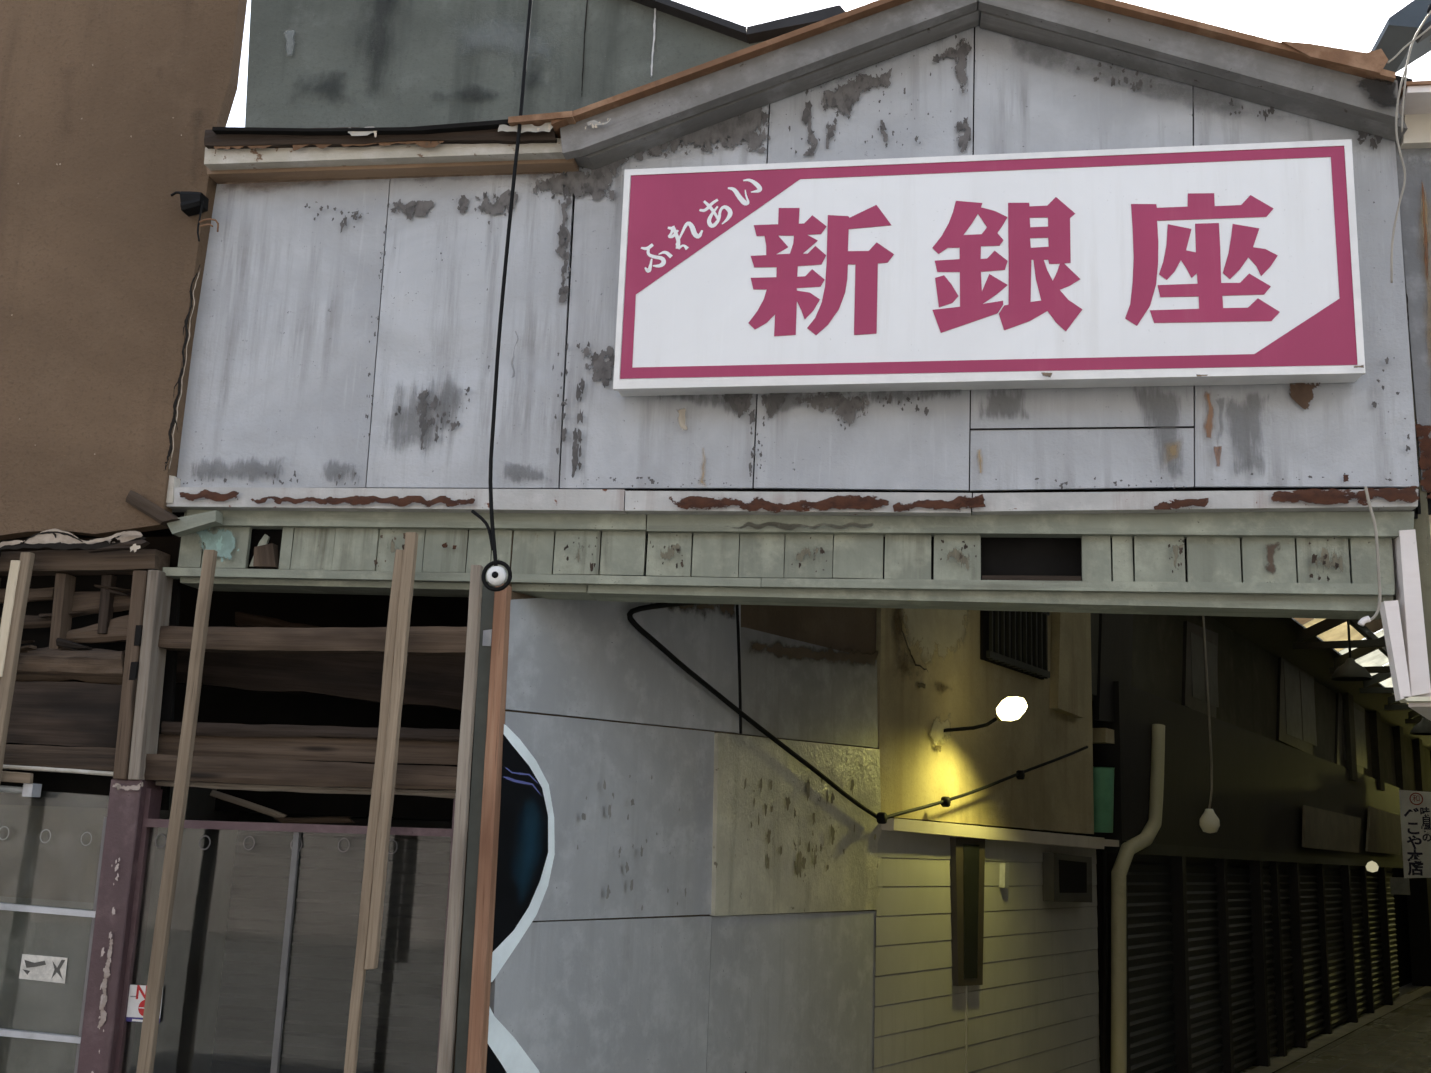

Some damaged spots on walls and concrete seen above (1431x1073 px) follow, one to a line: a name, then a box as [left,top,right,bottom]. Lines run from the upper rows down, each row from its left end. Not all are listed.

peeling [930,35,972,93]
peeling [786,55,929,156]
peeling [950,111,971,153]
rust [1422,183,1431,352]
peeling [552,341,616,487]
rust [1289,383,1320,409]
rust [179,489,475,508]
rust [669,452,986,513]
rust [1154,498,1209,510]
rust [1271,420,1431,506]
peeling [97,932,113,1032]